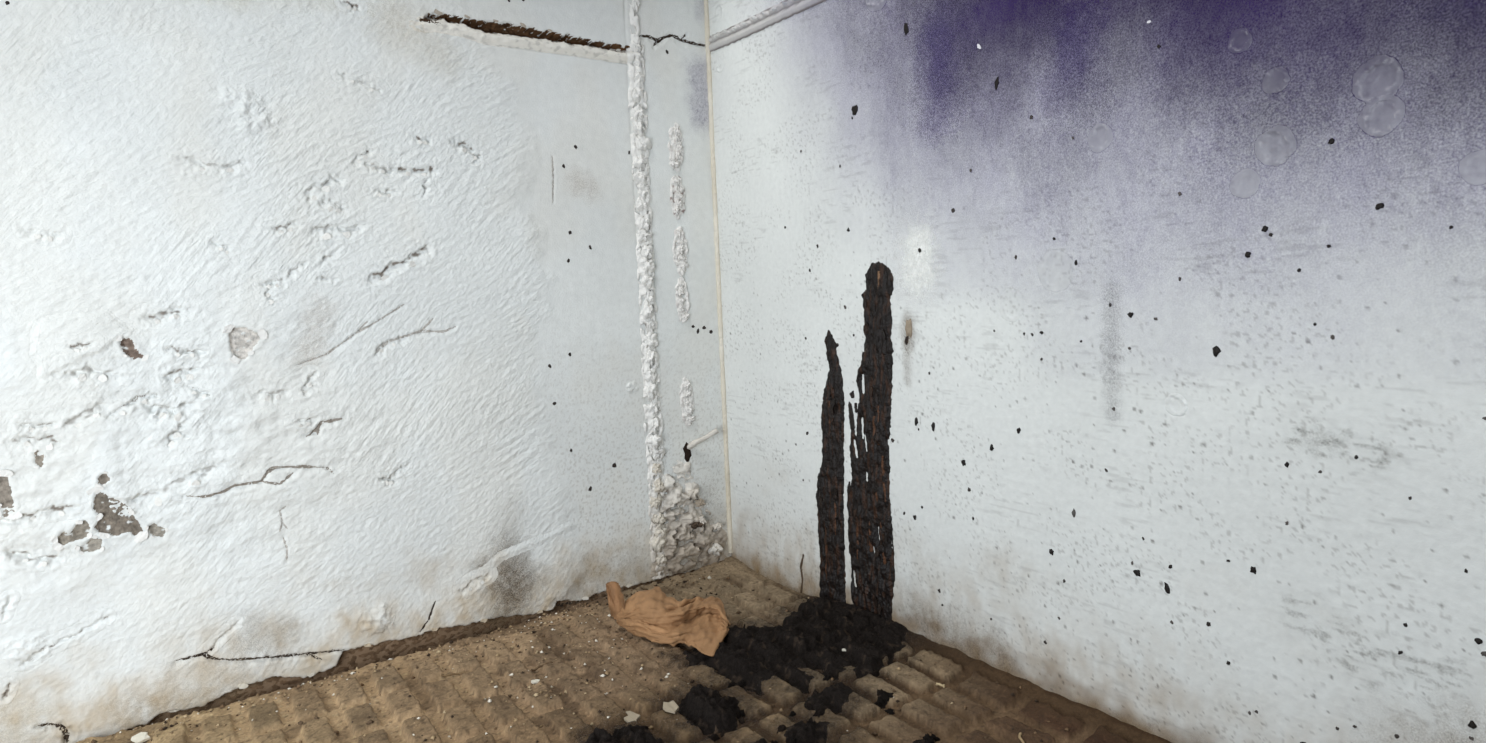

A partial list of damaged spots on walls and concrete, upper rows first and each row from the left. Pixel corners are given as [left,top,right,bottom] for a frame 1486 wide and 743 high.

crack [639,34,705,47]
spalling [262,126,491,241]
spalling [252,232,443,313]
spalling [366,327,411,362]
spalling [245,364,325,433]
spalling [0,295,268,573]
crack [187,418,342,560]
spalling [453,564,499,600]
crack [176,648,344,661]